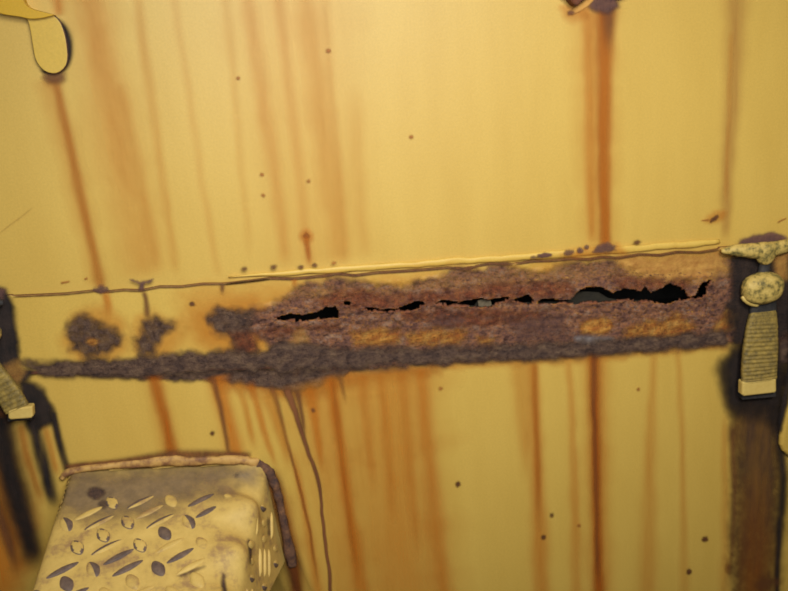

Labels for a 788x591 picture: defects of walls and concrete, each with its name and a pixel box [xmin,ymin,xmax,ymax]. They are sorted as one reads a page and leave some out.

rust [739,232,787,244]
rust [0,251,788,591]